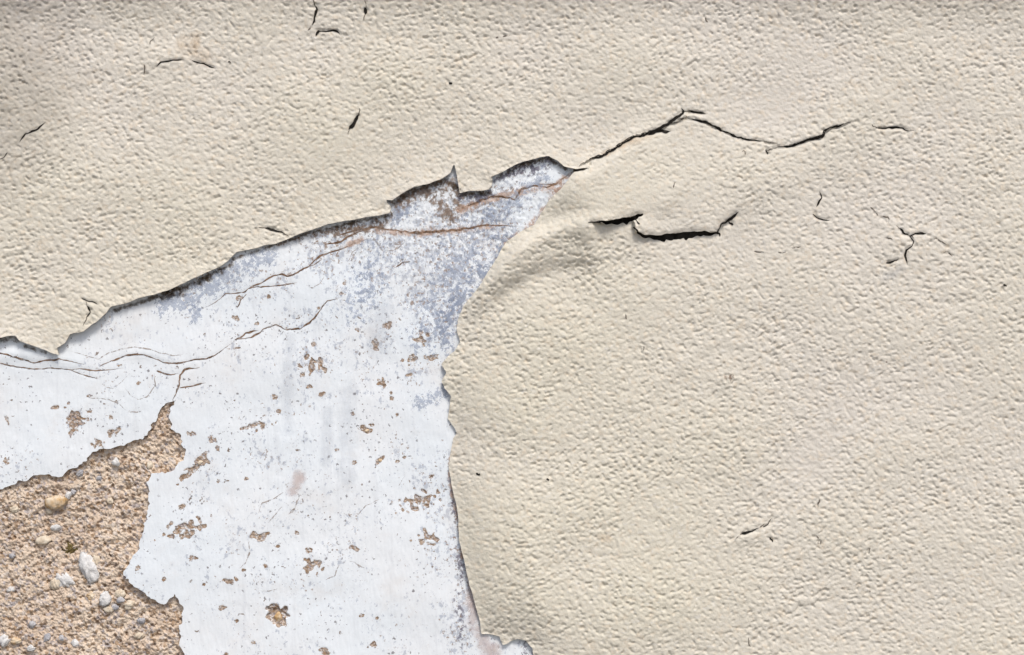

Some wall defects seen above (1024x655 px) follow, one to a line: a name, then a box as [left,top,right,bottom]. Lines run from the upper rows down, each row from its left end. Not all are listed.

crack [308,0,340,36]
crack [144,37,214,73]
crack [0,108,914,413]
crack [871,207,952,264]
peeling [0,156,573,655]